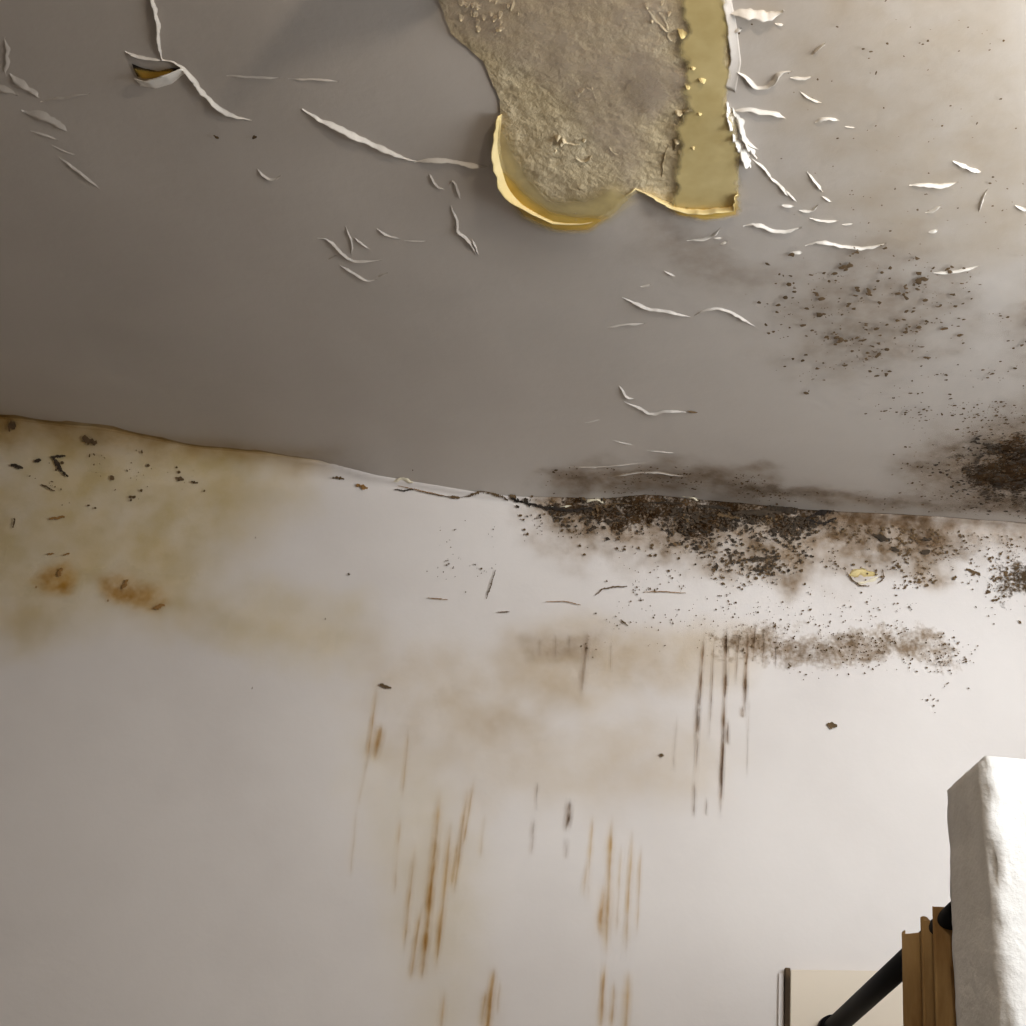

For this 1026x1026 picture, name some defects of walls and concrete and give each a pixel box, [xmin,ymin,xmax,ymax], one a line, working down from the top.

peeling [439,0,854,245]
peeling [318,226,389,282]
damp [11,455,68,491]
damp [82,435,116,490]
damp [516,222,1026,701]